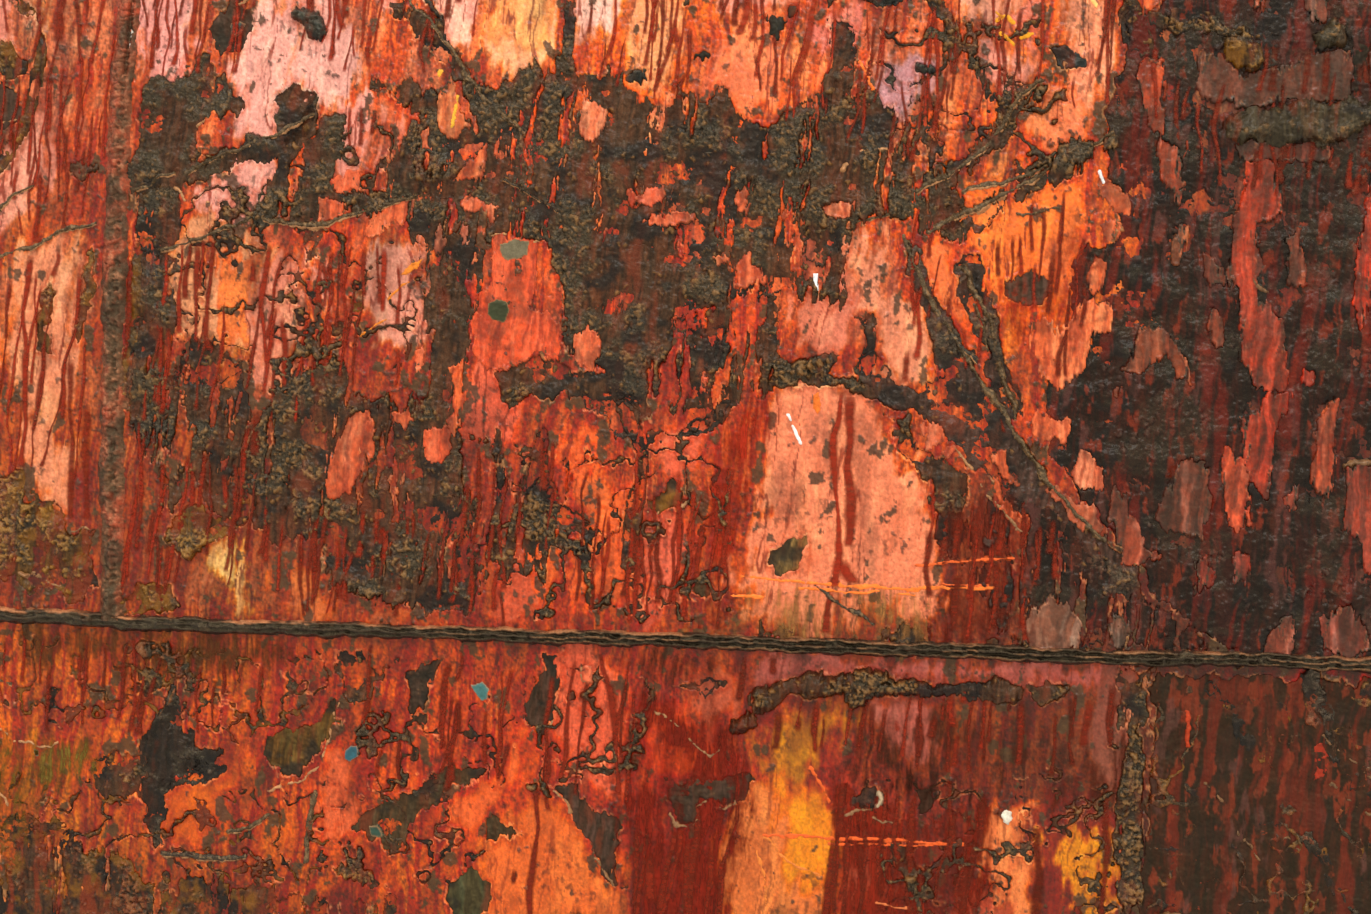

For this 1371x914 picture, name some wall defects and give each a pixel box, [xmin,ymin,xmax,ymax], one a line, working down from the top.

rust [0,0,115,242]
rust [120,0,1371,661]
rust [0,248,99,604]
peeling [579,665,594,686]
peeling [471,682,489,701]
peeling [0,728,59,756]
peeling [268,702,340,792]
peeling [345,746,358,761]
rust [0,638,1371,914]
peeling [668,800,737,828]
peeling [844,808,893,824]
peeling [369,824,384,838]